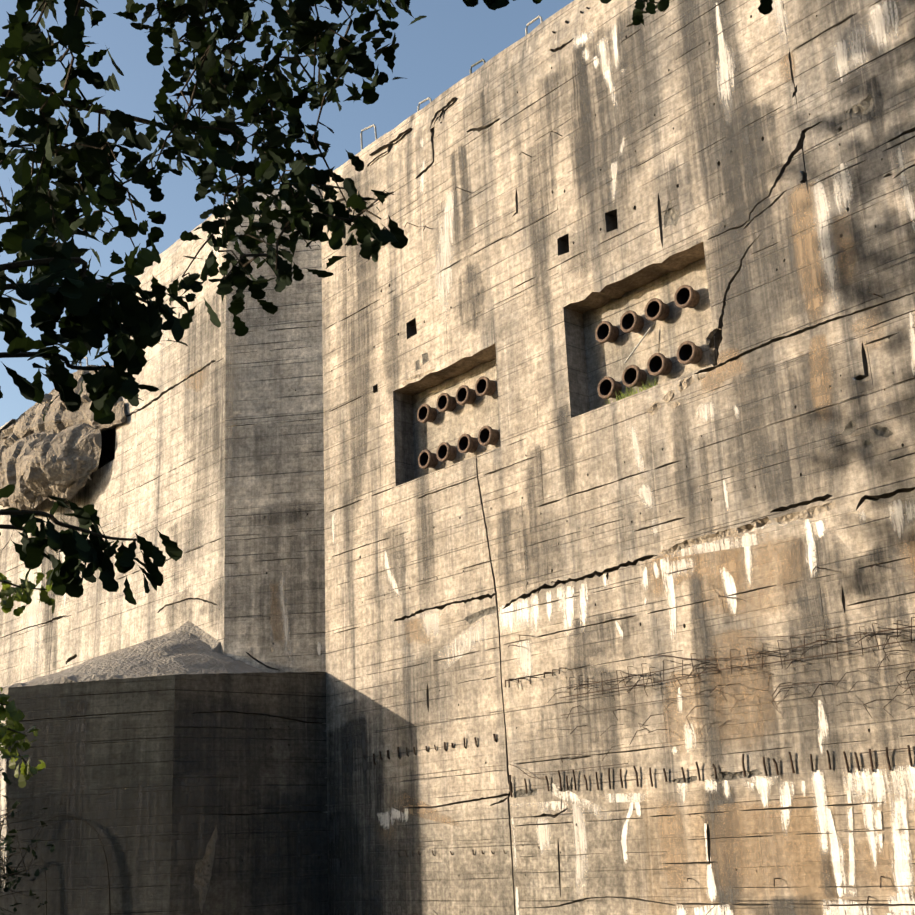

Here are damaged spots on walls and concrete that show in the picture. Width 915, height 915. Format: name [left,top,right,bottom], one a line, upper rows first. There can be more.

crack [367,97,457,179]
damp [436,145,483,329]
damp [529,14,650,292]
damp [679,0,859,354]
crack [695,121,915,374]
spalling [844,86,873,117]
crack [394,456,676,915]
damp [642,524,769,915]
crack [770,494,832,513]
damp [744,747,915,915]
damp [753,499,915,760]
crack [856,487,915,510]